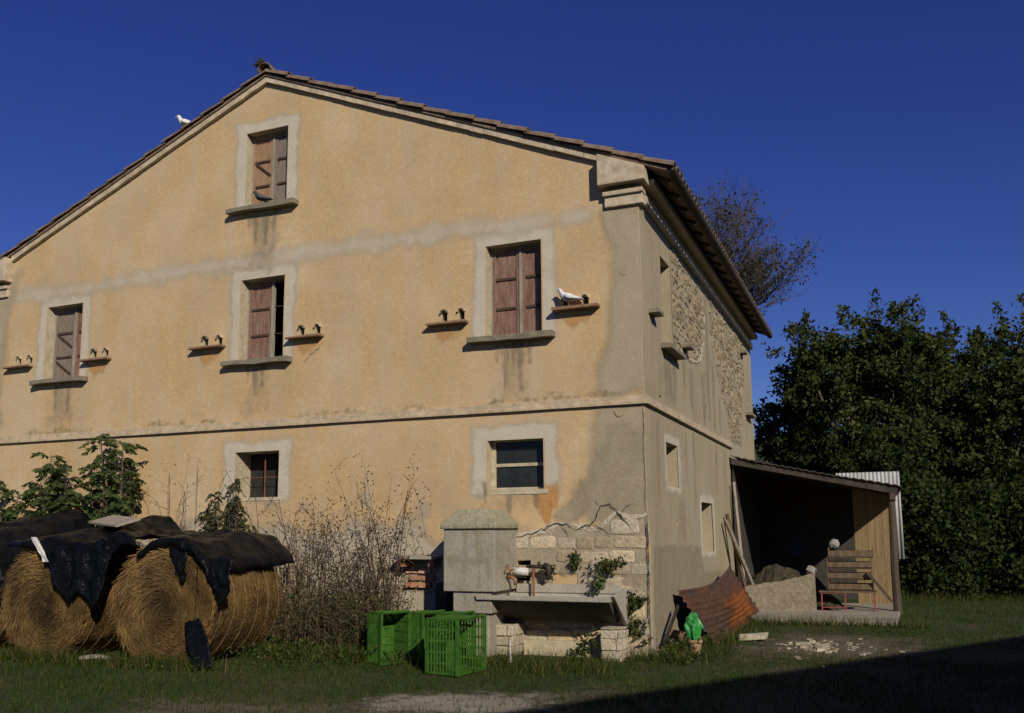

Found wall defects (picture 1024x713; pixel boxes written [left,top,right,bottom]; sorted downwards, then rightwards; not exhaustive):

flaking render [593,207,645,472]
spalling [670,247,744,446]
peeling [257,518,444,627]
spalling [509,510,652,659]
crack [517,412,651,647]